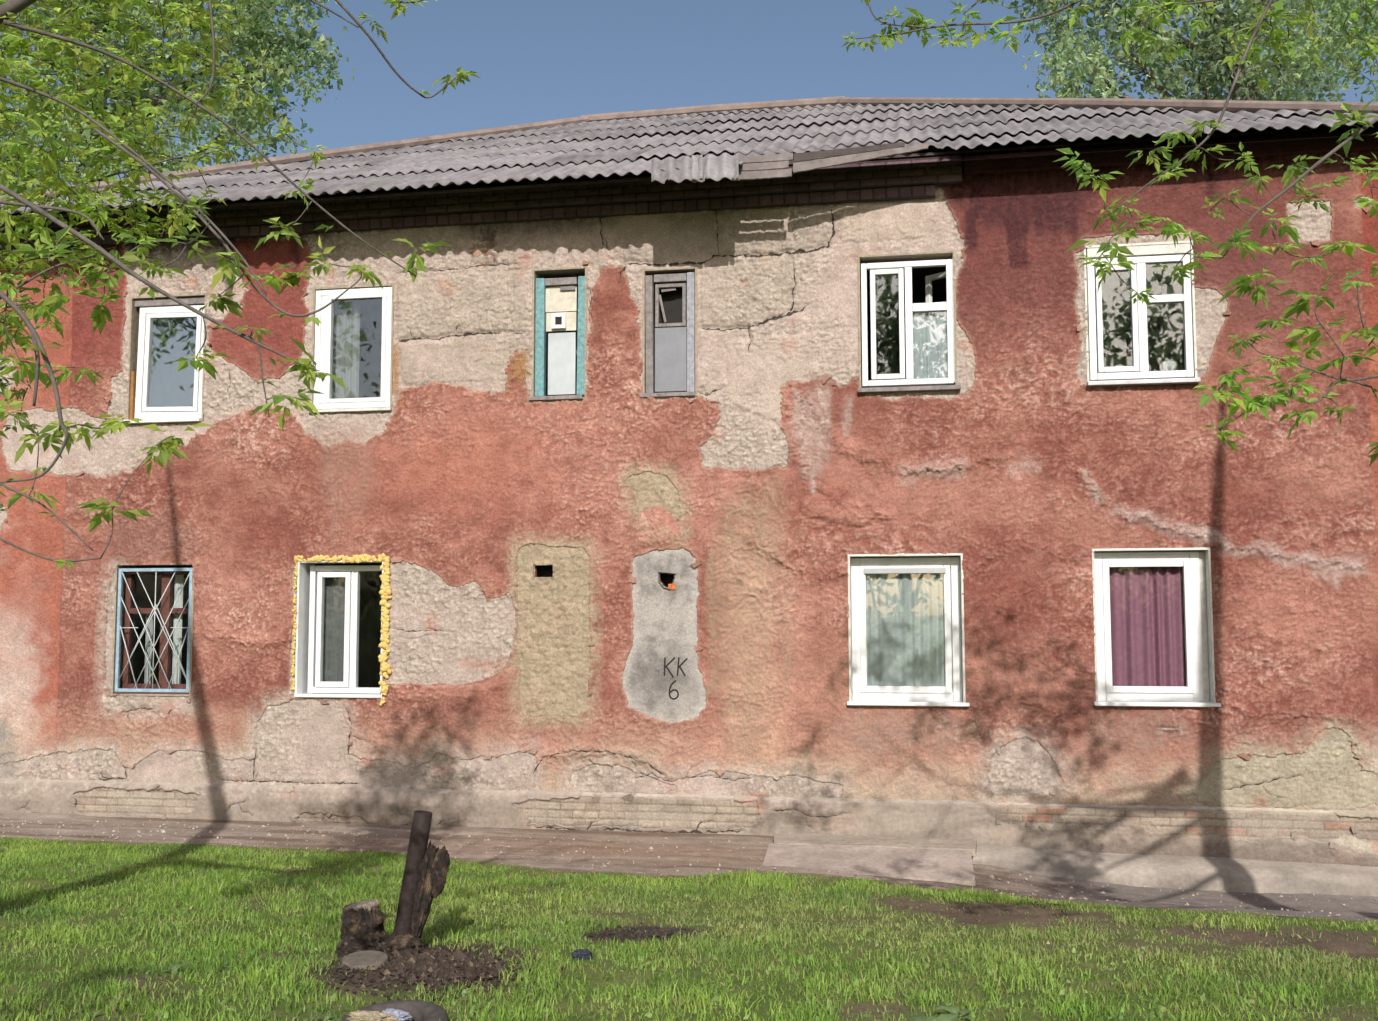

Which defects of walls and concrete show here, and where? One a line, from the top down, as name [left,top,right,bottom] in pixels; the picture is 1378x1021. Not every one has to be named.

damp [951,144,1117,265]
spalling [0,186,976,478]
crack [588,210,835,351]
spalling [384,556,516,685]
spalling [0,749,256,819]
flaking render [513,763,843,833]
spalling [988,727,1378,857]